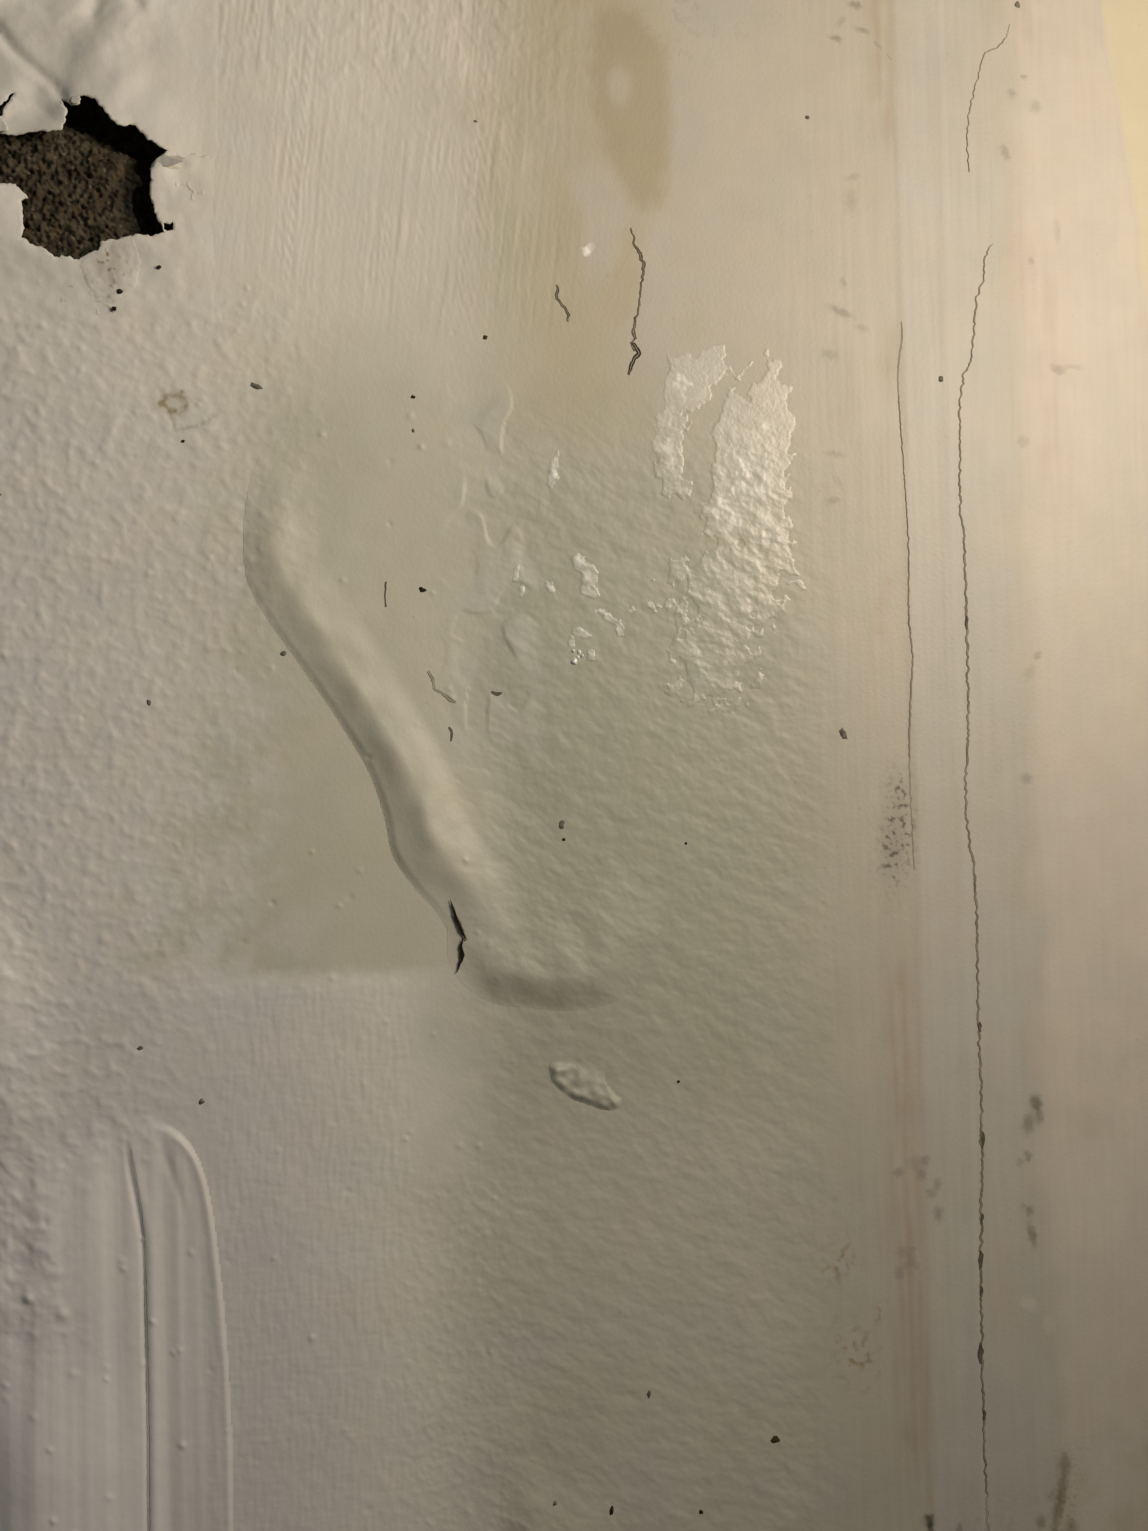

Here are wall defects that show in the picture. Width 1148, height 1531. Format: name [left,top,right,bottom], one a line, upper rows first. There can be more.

peeling [0,0,219,321]
damp [444,0,806,714]
crack [628,228,646,375]
crack [966,24,1010,172]
damp [867,748,926,914]
crack [958,244,993,1531]